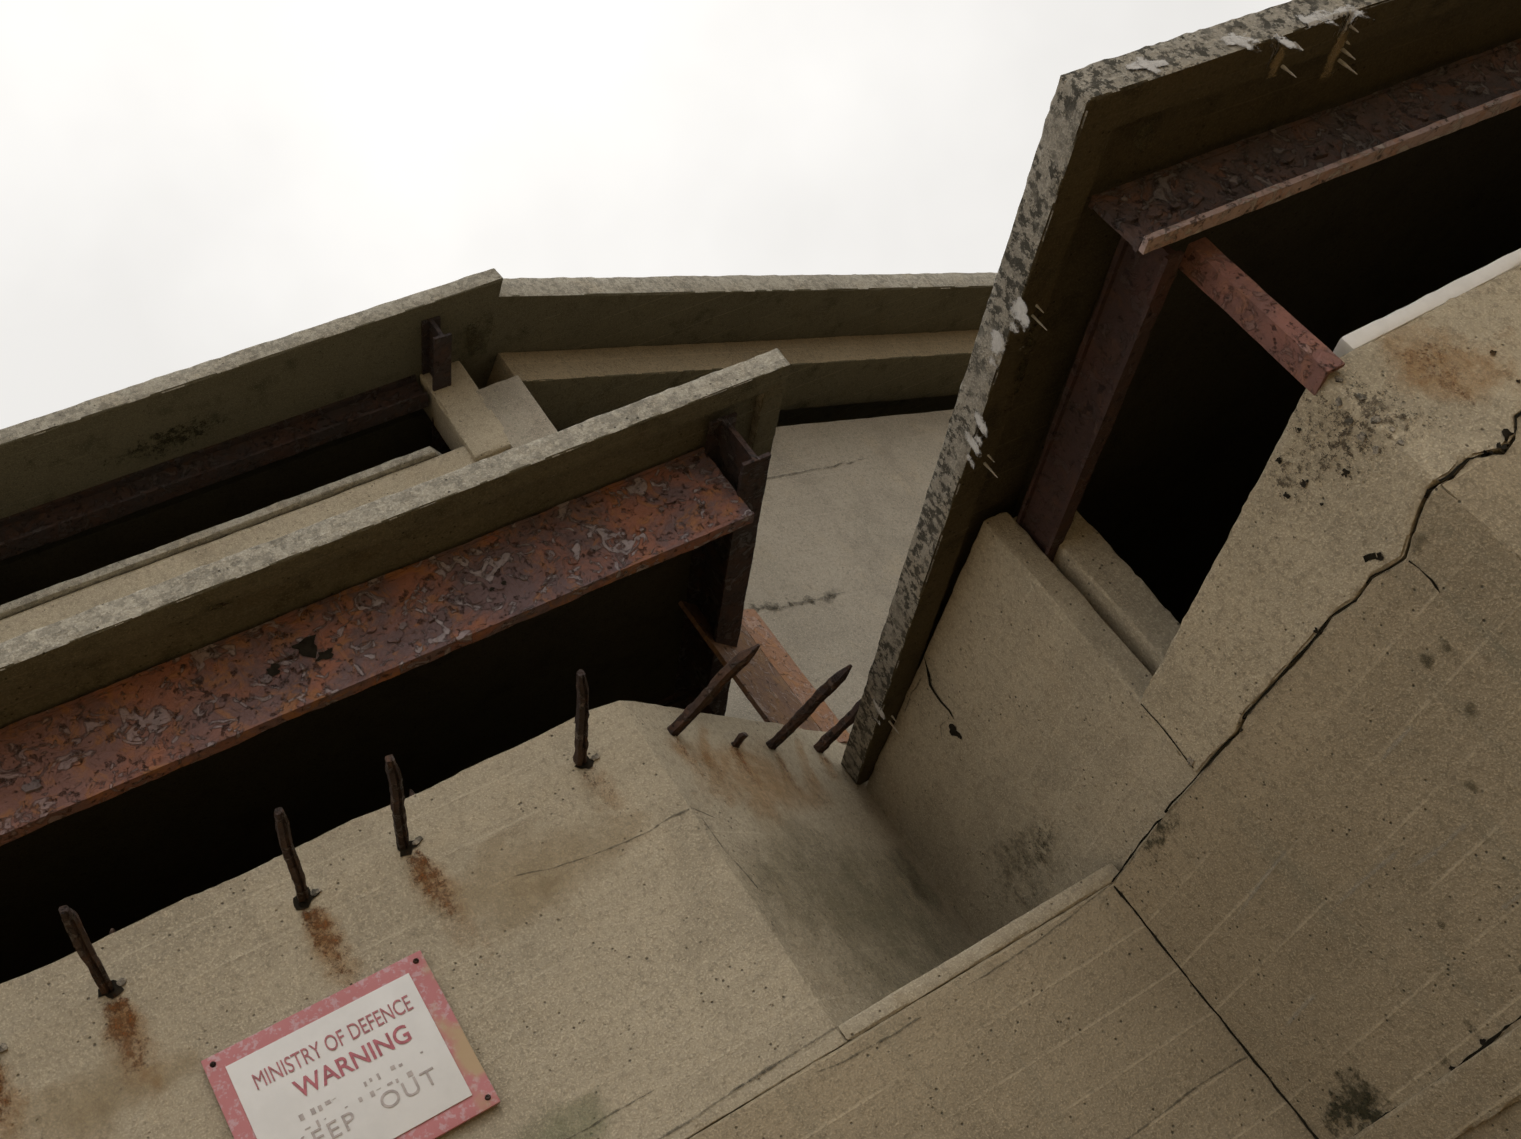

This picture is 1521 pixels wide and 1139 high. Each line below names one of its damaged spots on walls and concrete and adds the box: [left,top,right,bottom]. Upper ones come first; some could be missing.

spalling [1265,371,1449,518]
crack [1424,380,1521,498]
crack [906,657,962,739]
rust [574,753,600,780]
rust [397,836,456,915]
crack [968,552,1440,1139]
rust [293,887,351,973]
rust [98,978,149,1071]
crack [1438,1015,1521,1080]
leakage [1322,1067,1390,1136]